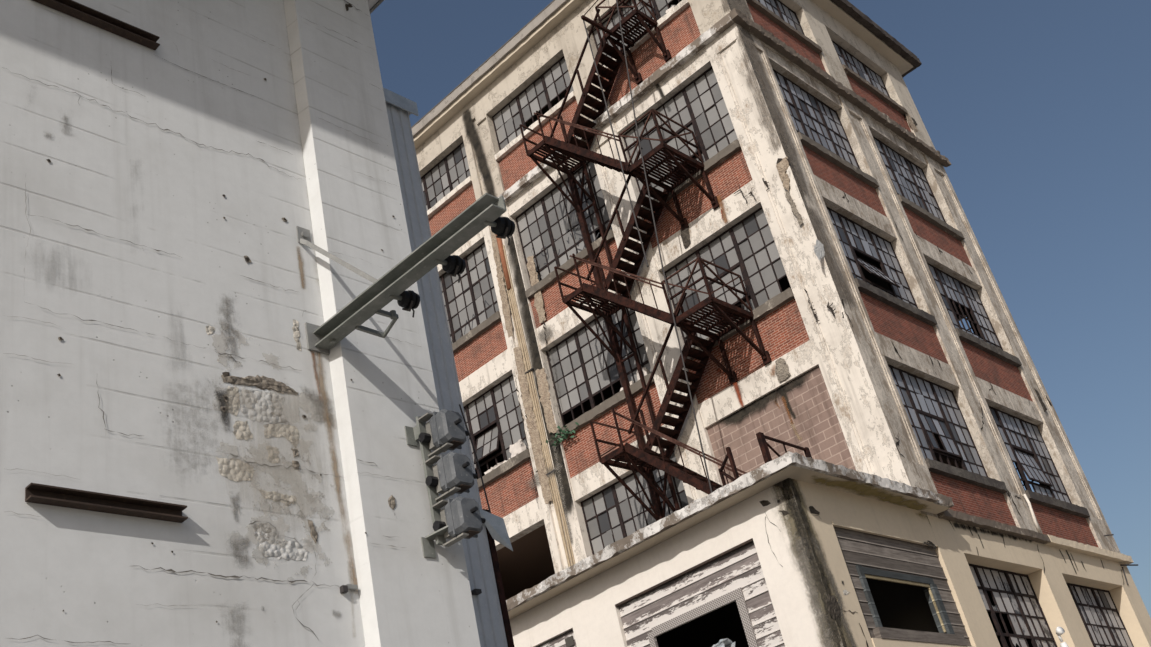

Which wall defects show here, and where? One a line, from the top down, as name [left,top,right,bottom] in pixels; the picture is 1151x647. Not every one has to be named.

crack [6,67,300,179]
spalling [772,358,790,382]
peeling [216,457,296,506]
peeling [220,372,307,469]
rust [312,352,344,514]
crack [140,548,339,639]
peeling [250,519,318,561]
leakage [773,478,856,647]